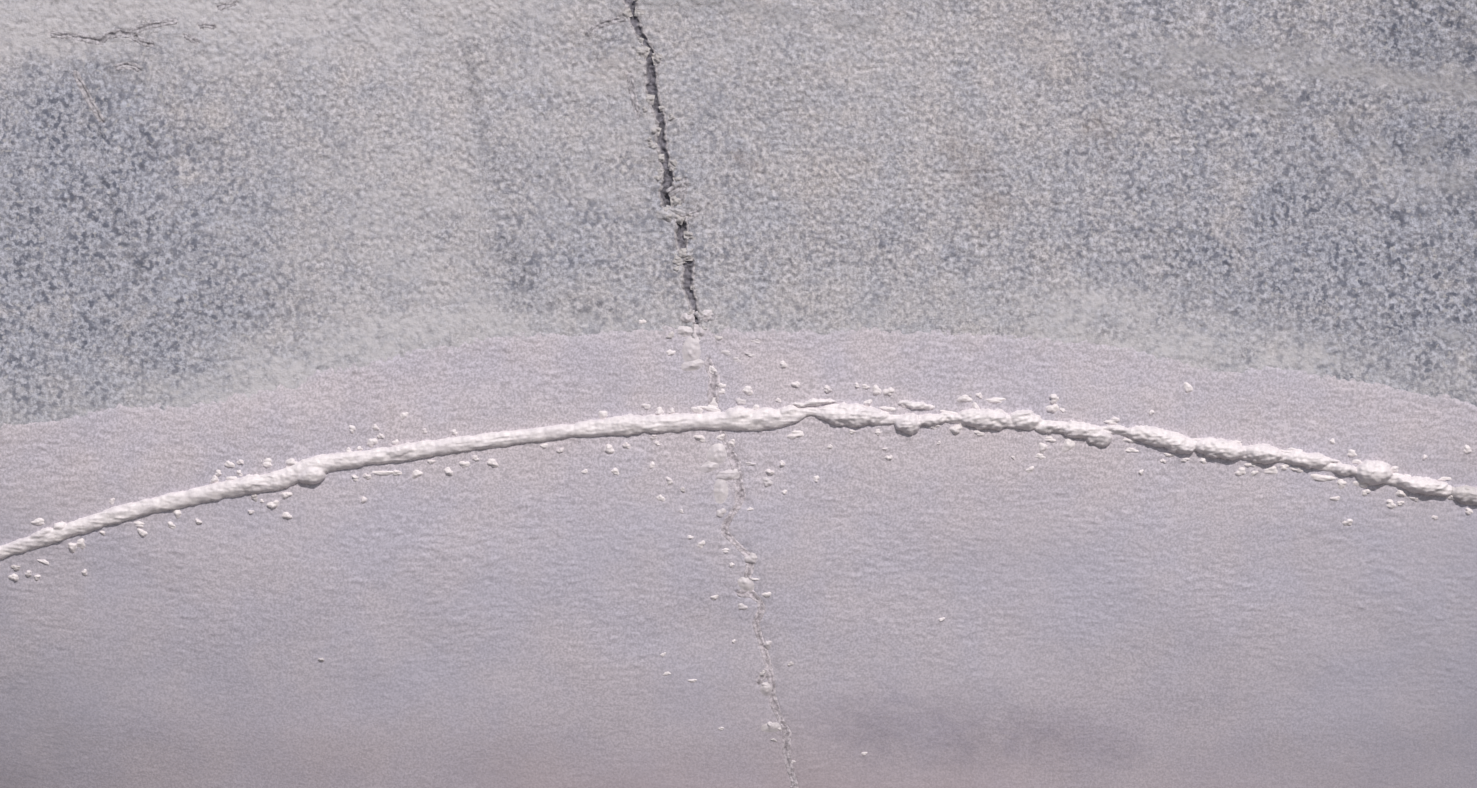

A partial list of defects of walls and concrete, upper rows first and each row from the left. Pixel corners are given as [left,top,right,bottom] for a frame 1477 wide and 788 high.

crack [50,0,238,123]
crack [585,0,820,788]